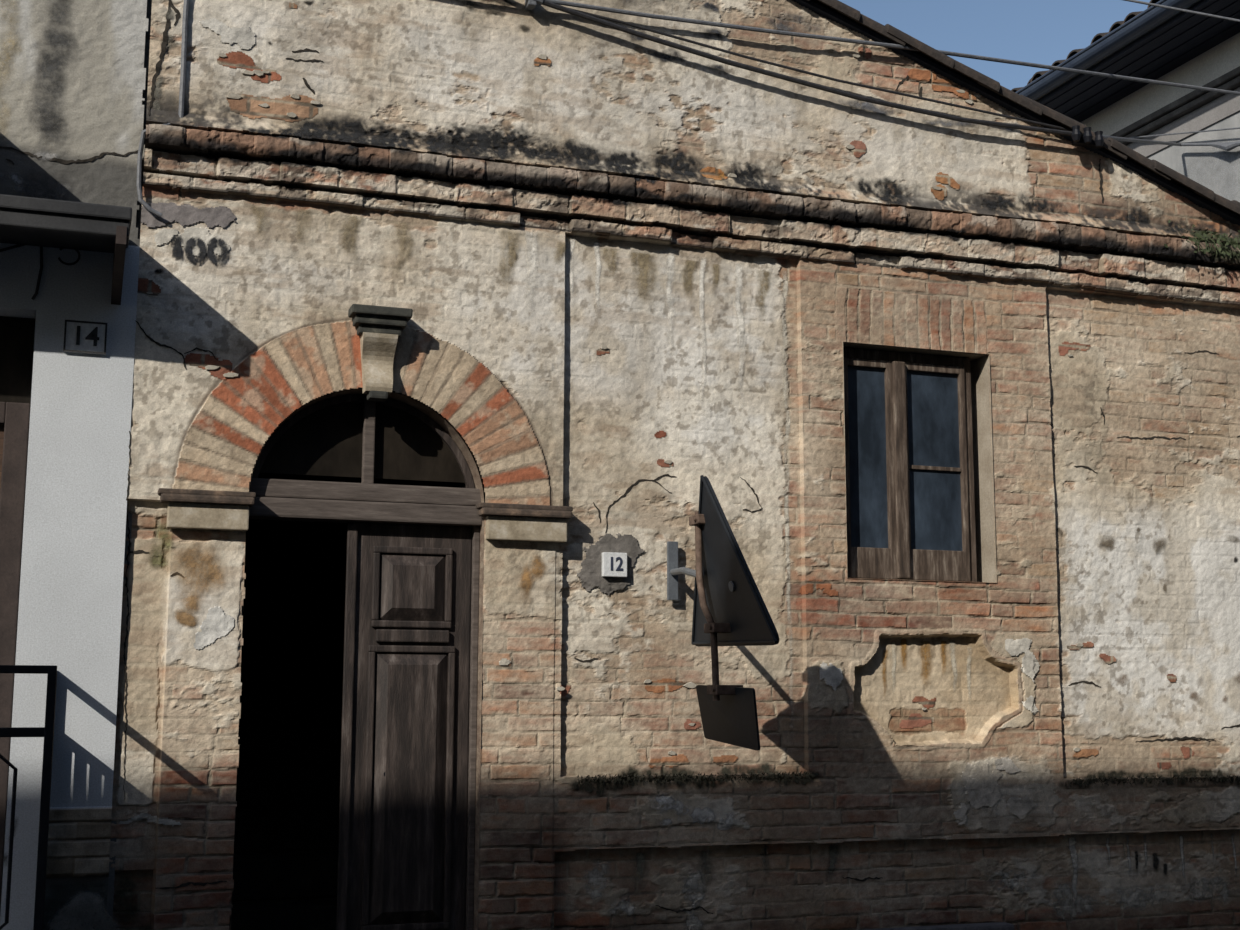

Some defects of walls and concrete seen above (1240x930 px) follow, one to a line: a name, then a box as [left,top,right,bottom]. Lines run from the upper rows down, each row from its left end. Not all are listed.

flaking render [908,66,981,104]
crack [0,146,138,165]
damp [189,140,246,162]
flaking render [845,140,867,158]
damp [251,120,970,241]
flaking render [931,172,960,201]
damp [981,195,1057,213]
damp [1040,221,1240,271]
damp [631,252,719,389]
crack [136,321,217,370]
crack [593,474,676,533]
flaking render [1067,642,1116,664]